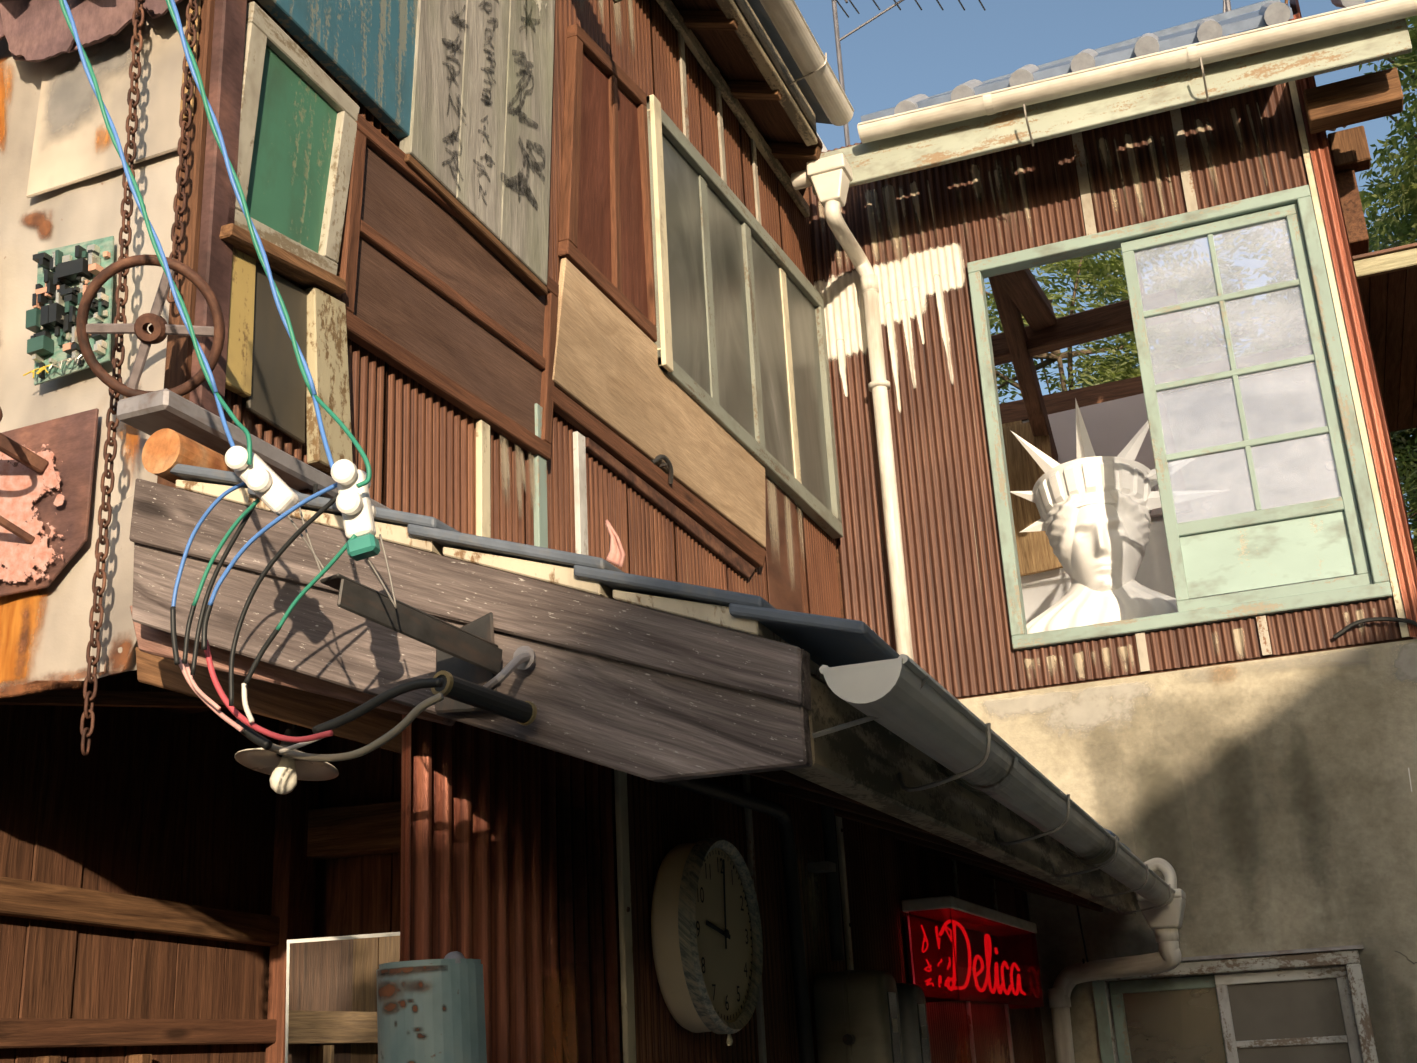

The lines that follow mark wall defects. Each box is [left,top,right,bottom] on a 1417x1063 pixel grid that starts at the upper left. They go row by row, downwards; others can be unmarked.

corrosion [0,62,11,146]
peeling [0,444,64,583]
corrosion [0,590,132,696]
corrosion [378,966,445,1039]